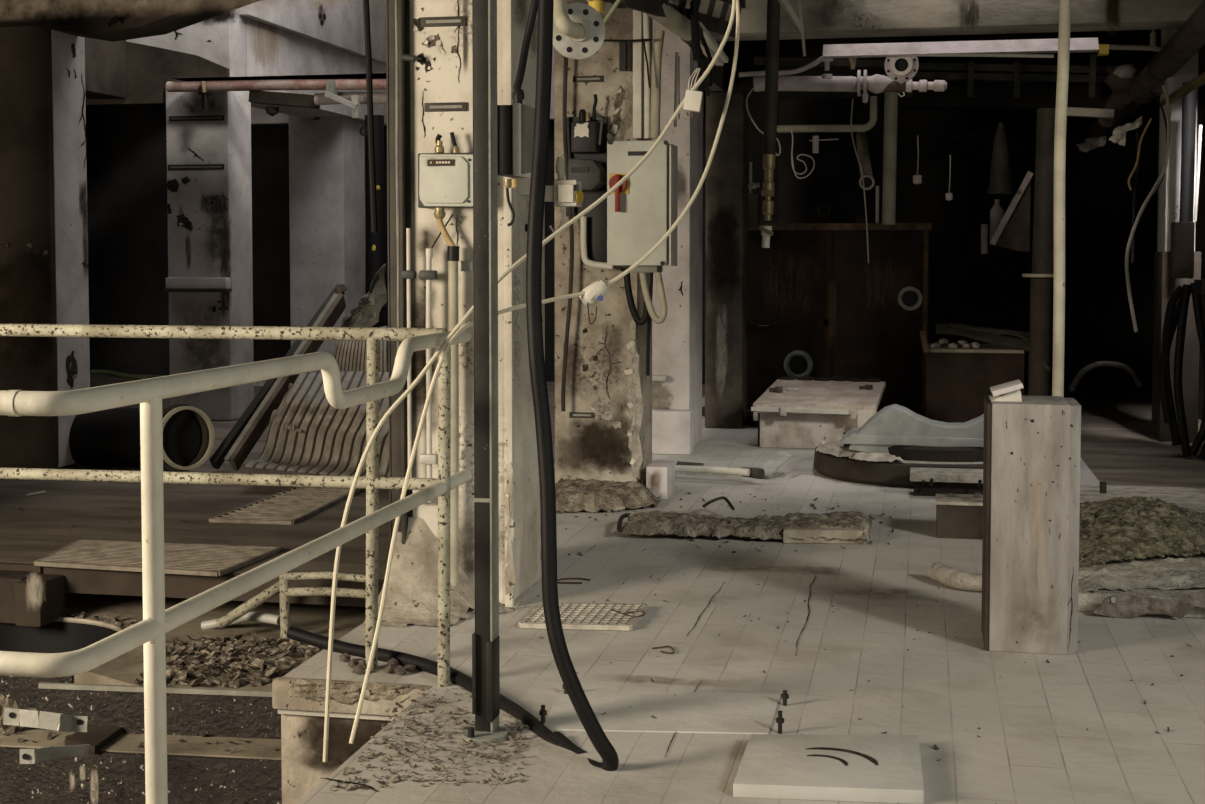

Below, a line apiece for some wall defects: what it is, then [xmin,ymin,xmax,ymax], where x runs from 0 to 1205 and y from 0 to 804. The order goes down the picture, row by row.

spalling [167,176,193,231]
peeling [589,319,644,479]
damp [559,404,631,473]
crack [687,583,724,636]
crack [795,572,817,656]